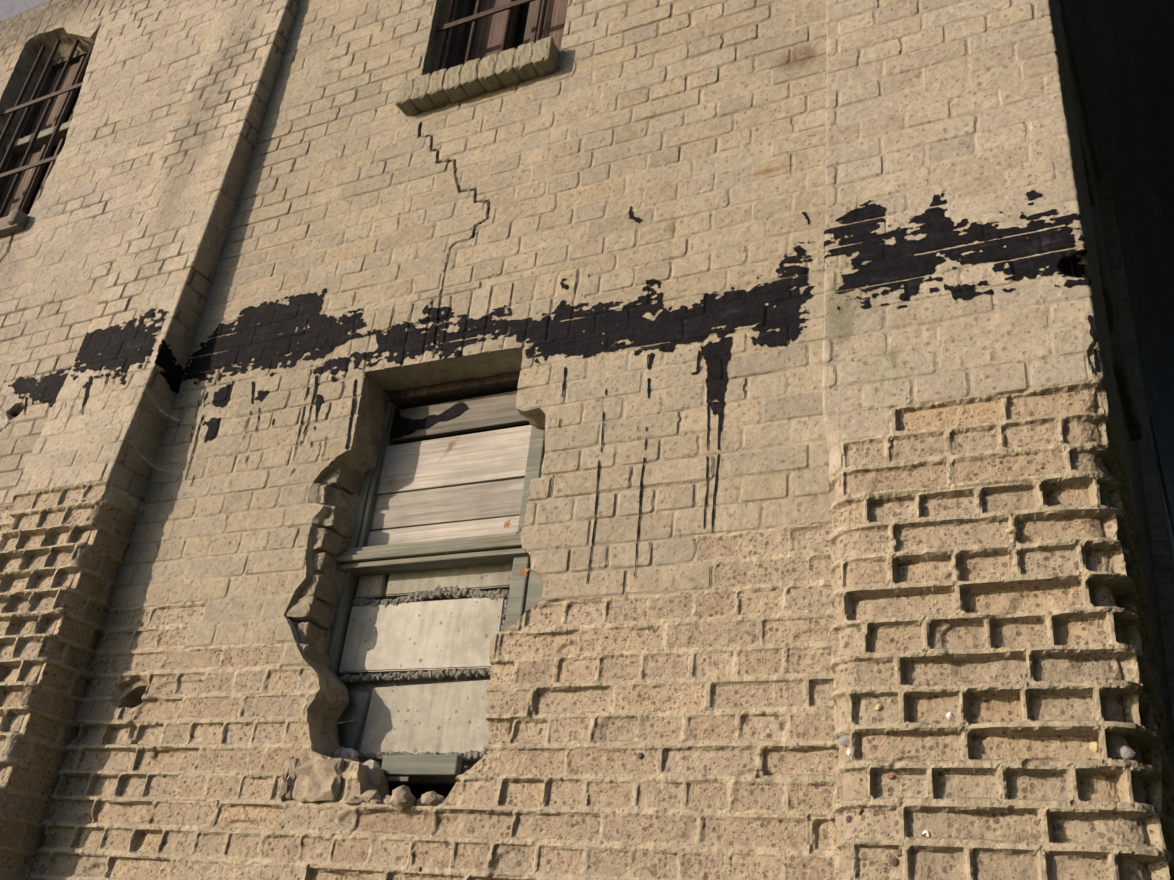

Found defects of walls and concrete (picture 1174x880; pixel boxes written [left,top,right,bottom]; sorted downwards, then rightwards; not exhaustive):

crack [418,124,490,238]
spalling [0,382,1174,880]